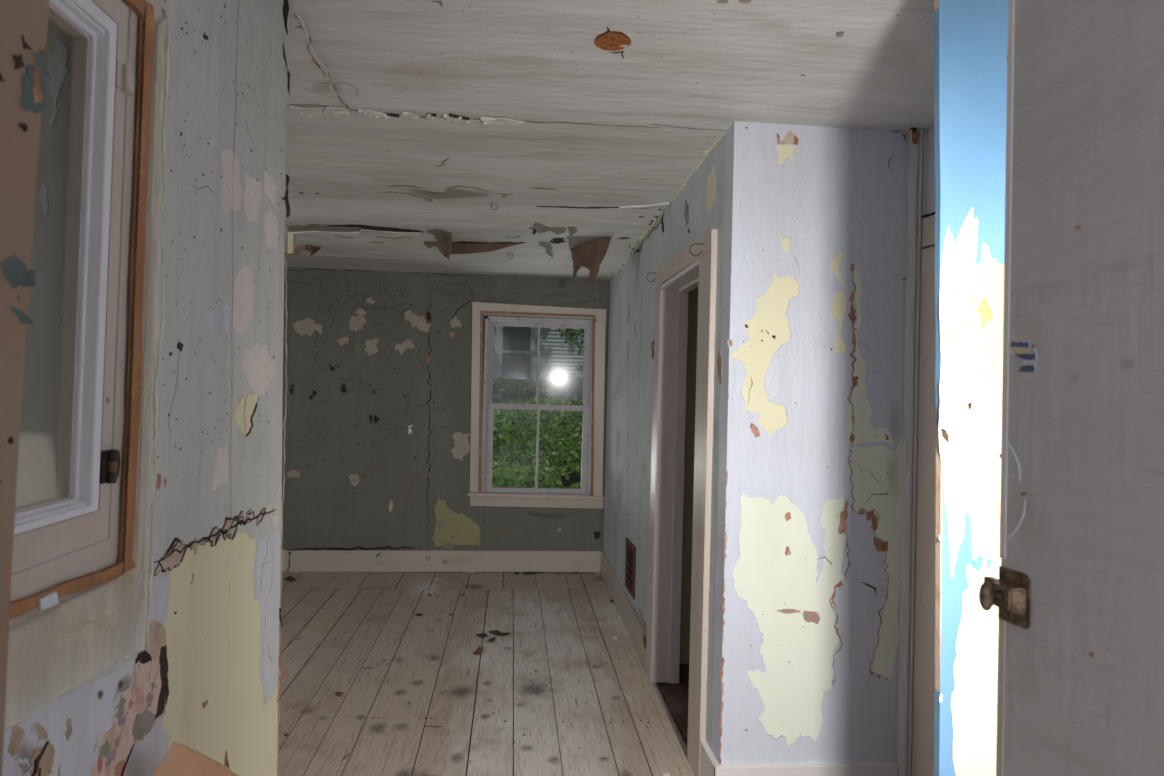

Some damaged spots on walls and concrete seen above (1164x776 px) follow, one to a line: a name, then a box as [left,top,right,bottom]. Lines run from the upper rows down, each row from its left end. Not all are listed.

peeling [13,35,69,132]
crack [233,0,255,170]
crack [269,12,727,131]
spalling [0,253,36,289]
peeling [530,222,578,238]
peeling [977,297,993,329]
crack [191,185,601,663]
peeling [432,483,481,549]
peeling [717,230,903,746]
peeling [2,648,146,776]
peeling [125,499,287,776]
peeling [939,556,999,776]